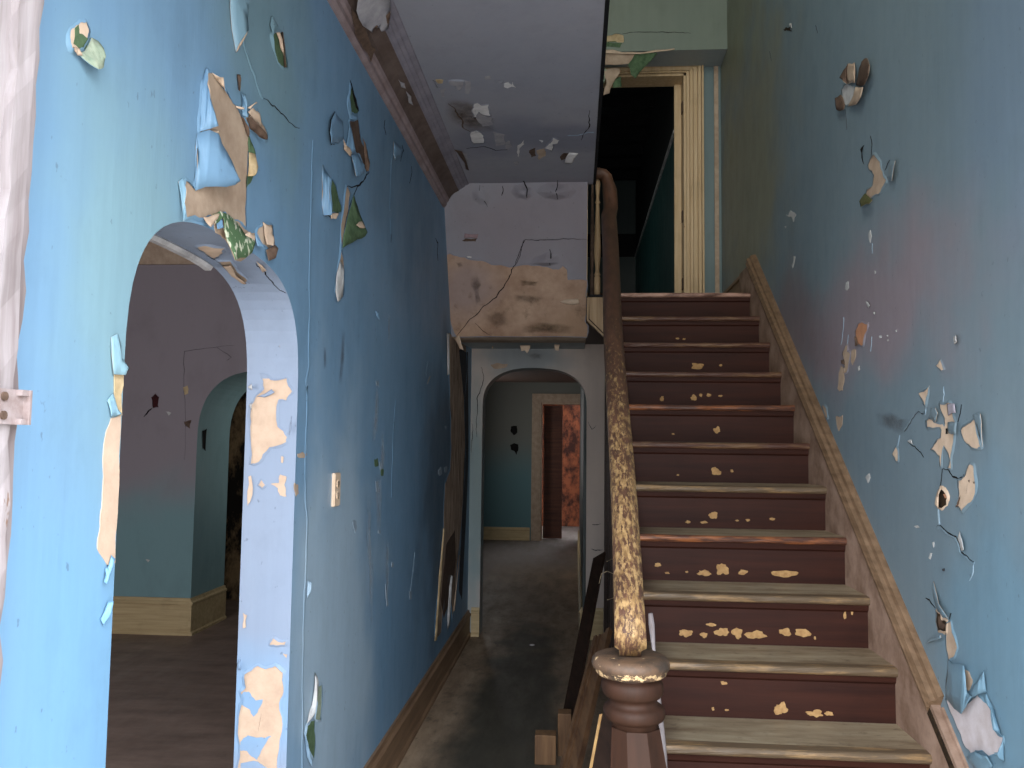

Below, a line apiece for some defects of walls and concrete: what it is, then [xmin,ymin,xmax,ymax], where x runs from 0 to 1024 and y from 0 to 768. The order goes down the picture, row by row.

peeling [65,19,106,70]
peeling [178,67,278,284]
peeling [322,81,370,303]
crack [458,237,587,335]
peeling [97,334,129,584]
peeling [247,373,295,506]
flaking render [434,253,589,641]
crack [903,409,925,458]
peeling [918,386,984,525]
crack [936,525,974,581]
peeling [236,636,288,768]
peeling [926,581,1005,768]